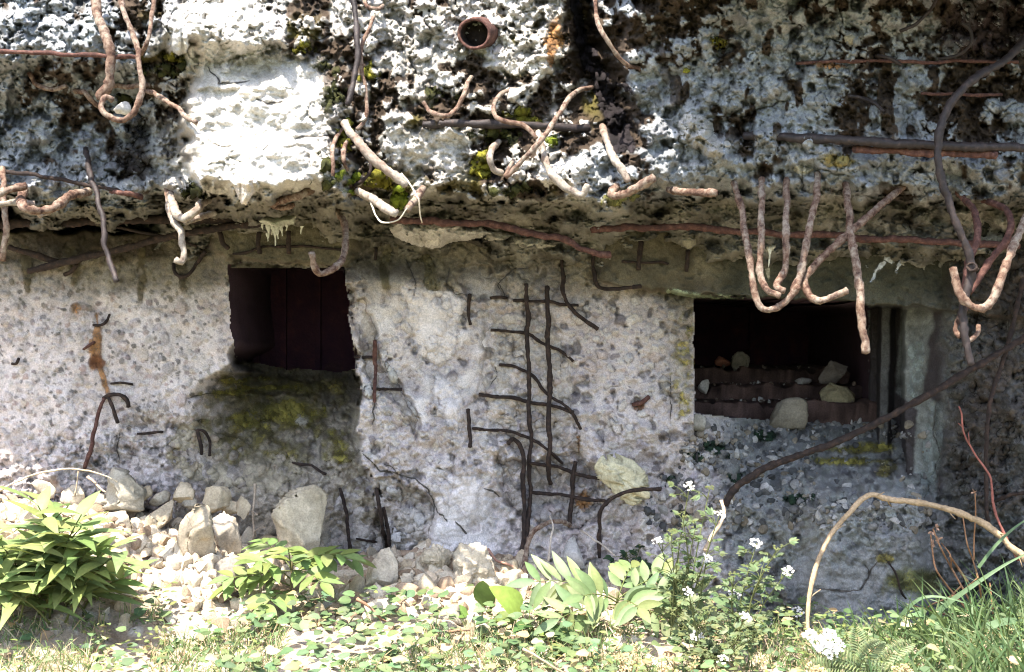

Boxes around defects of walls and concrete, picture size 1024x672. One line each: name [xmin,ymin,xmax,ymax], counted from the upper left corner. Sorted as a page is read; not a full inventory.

damp [944,0,1024,59]
efflorescence [258,215,304,246]
spalling [389,224,556,249]
corrosion [88,313,110,394]
damp [215,376,348,462]
spalling [481,313,601,530]
peeling [439,472,482,517]